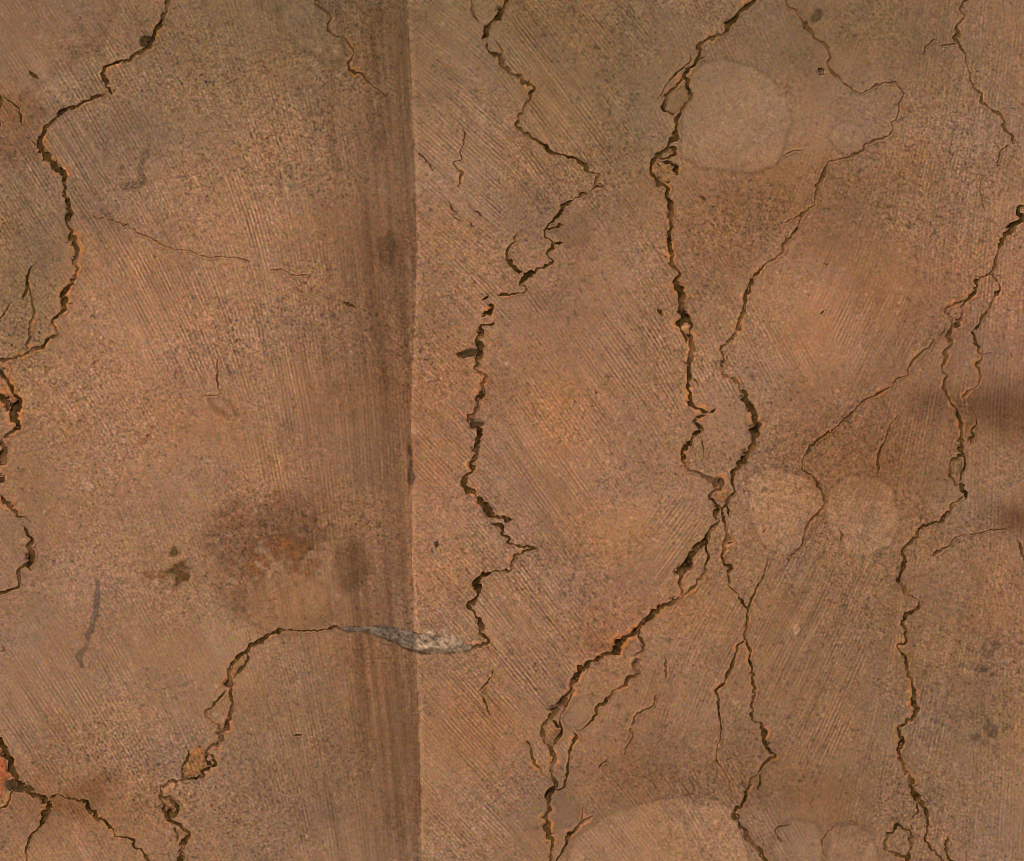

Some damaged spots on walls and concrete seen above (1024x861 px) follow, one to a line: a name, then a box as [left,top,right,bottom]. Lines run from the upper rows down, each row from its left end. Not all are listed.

crack [314,0,387,98]
crack [416,124,483,233]
crack [0,0,311,597]
crack [456,0,606,714]
crack [524,0,1024,861]
water stain [247,569,330,635]
crack [0,623,341,861]